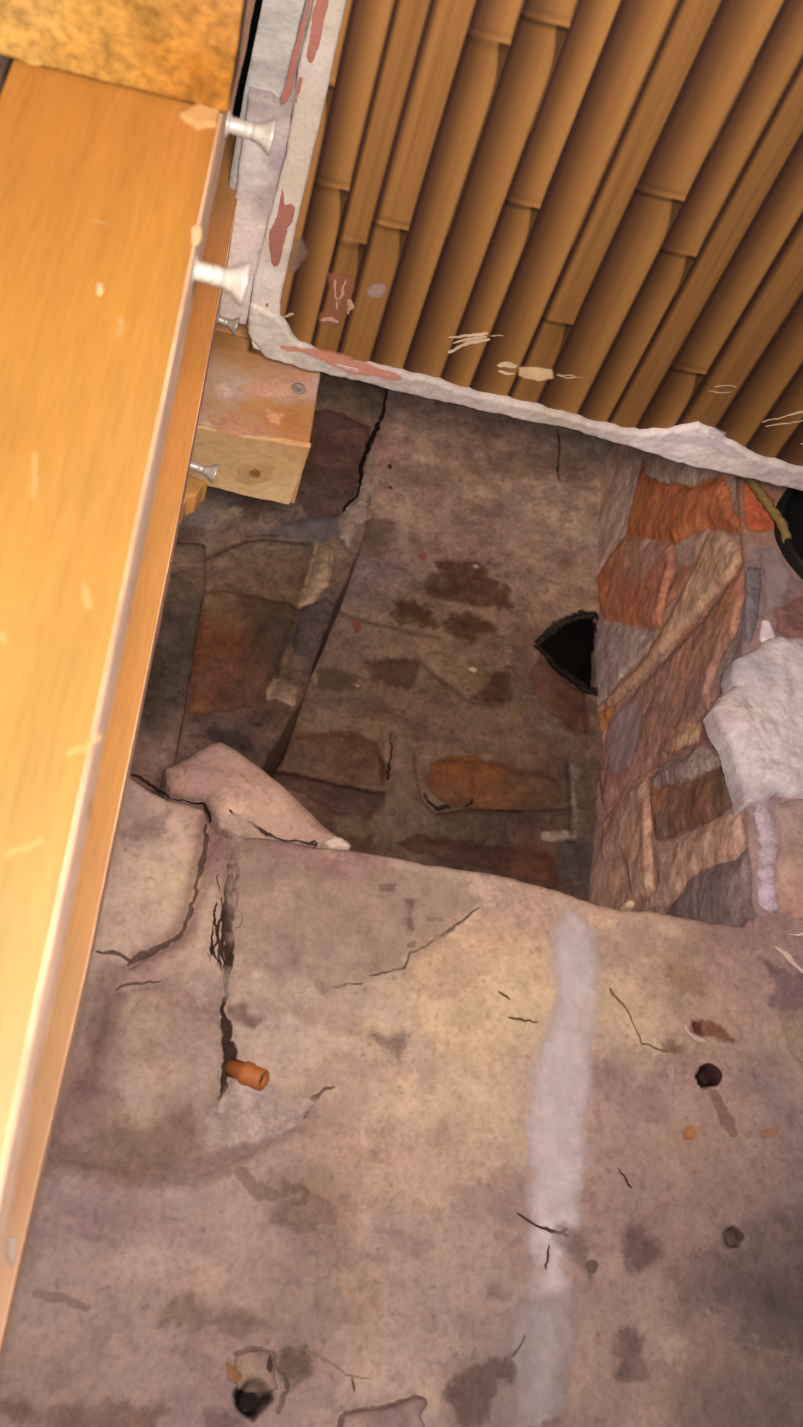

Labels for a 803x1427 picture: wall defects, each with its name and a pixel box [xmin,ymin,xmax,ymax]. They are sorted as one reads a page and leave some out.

peeling [280,0,329,105]
peeling [269,189,295,267]
flaking render [298,409,392,548]
flaking render [272,731,388,824]
crack [96,774,318,1101]
crack [333,907,480,988]
peeling [203,1080,316,1148]
leakage [537,937,594,1209]
spalling [233,1388,272,1420]
spalling [279,1345,310,1387]
spalling [446,1358,516,1426]
leakage [511,1292,574,1427]